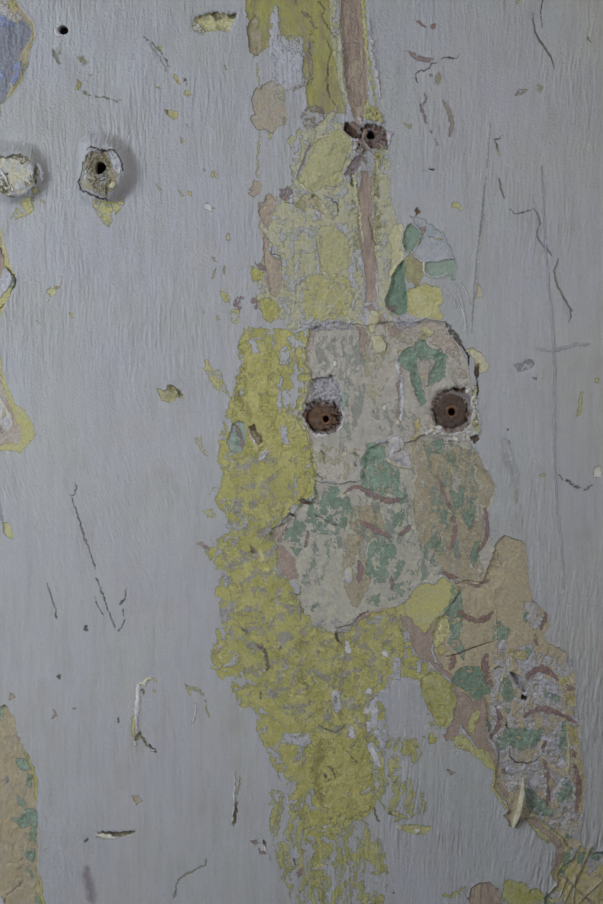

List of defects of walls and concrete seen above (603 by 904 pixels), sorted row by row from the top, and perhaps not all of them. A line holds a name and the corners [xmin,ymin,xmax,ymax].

peeling [0,0,35,109]
crack [516,0,555,69]
peeling [0,230,17,316]
crack [499,179,572,321]
peeling [0,358,36,454]
peeling [191,0,603,904]
peeling [0,694,45,904]